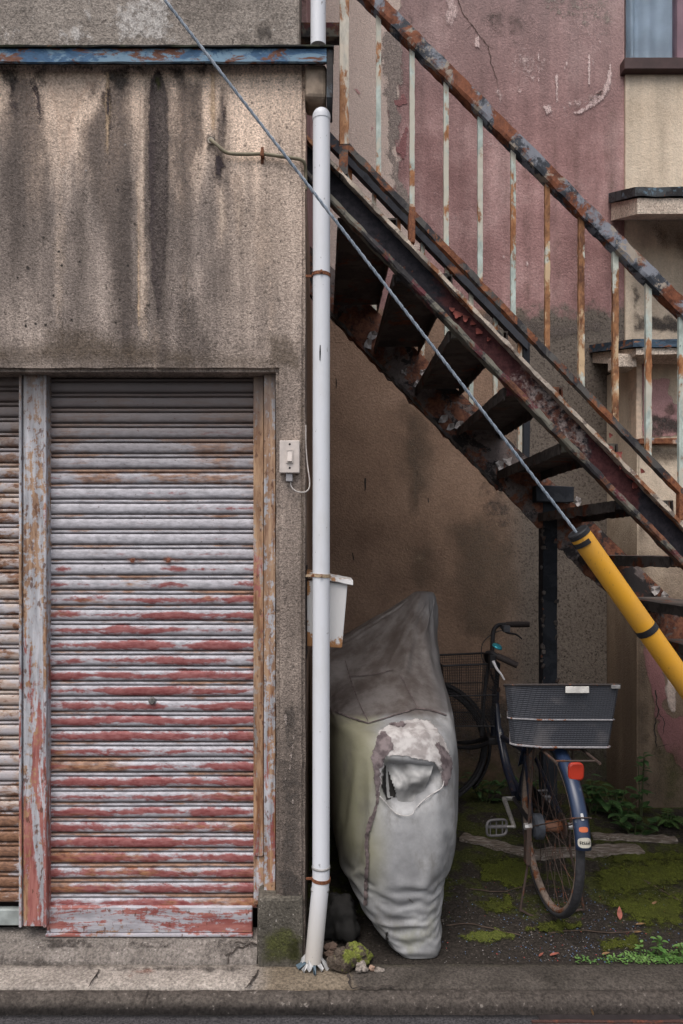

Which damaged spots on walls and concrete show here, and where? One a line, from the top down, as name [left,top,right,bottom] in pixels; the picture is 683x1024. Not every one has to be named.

crack [458,0,500,98]
leakage [6,66,241,362]
peeling [643,646,683,770]